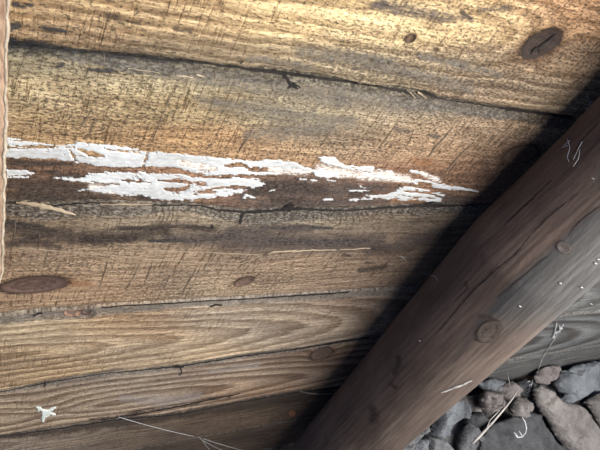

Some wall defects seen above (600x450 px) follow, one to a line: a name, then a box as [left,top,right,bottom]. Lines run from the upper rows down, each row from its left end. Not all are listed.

peeling [6,137,479,202]